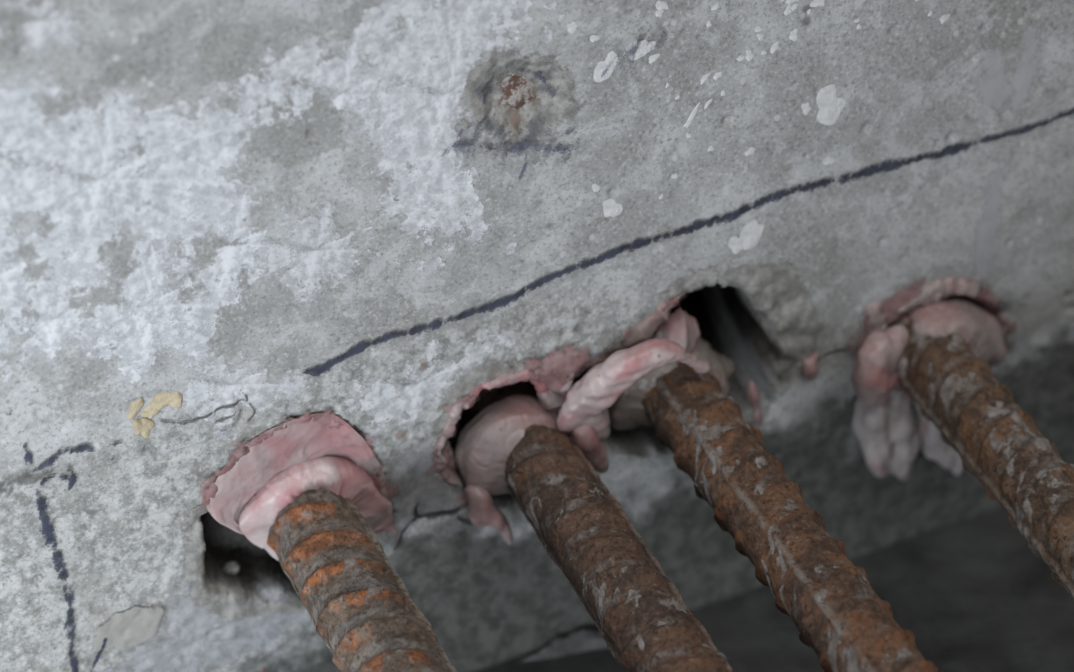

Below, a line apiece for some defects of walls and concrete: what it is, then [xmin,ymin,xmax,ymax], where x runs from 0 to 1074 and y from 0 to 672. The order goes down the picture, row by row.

efflorescence [0,0,566,444]
spalling [181,488,457,672]
spalling [430,354,568,441]
spalling [592,341,623,361]
spalling [505,425,733,672]
spalling [659,261,826,397]
spalling [641,353,938,672]
spalling [886,320,1074,599]